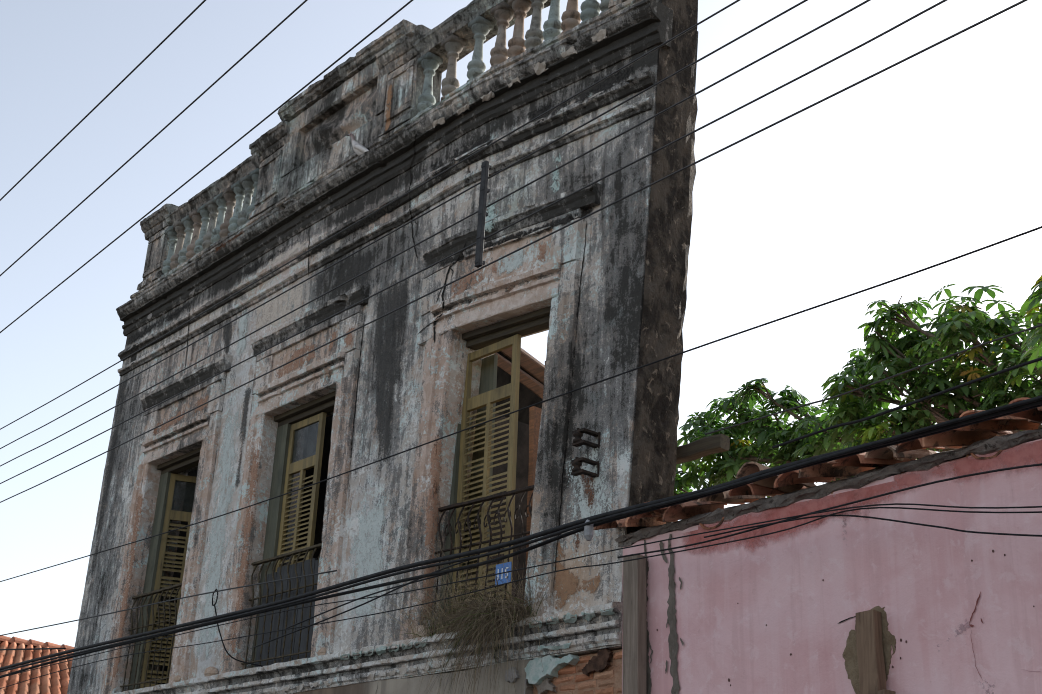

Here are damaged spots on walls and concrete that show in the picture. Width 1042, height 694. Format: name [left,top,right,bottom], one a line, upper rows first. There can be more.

leakage [528,65,633,125]
leakage [431,132,493,186]
leakage [228,242,295,282]
leakage [311,199,400,257]
peeling [451,248,525,298]
leakage [423,181,601,270]
leakage [251,249,408,479]
peeling [195,410,261,660]
flaking render [505,642,622,694]
flaking render [842,620,860,694]
flaking render [871,606,907,681]
crack [969,592,983,676]